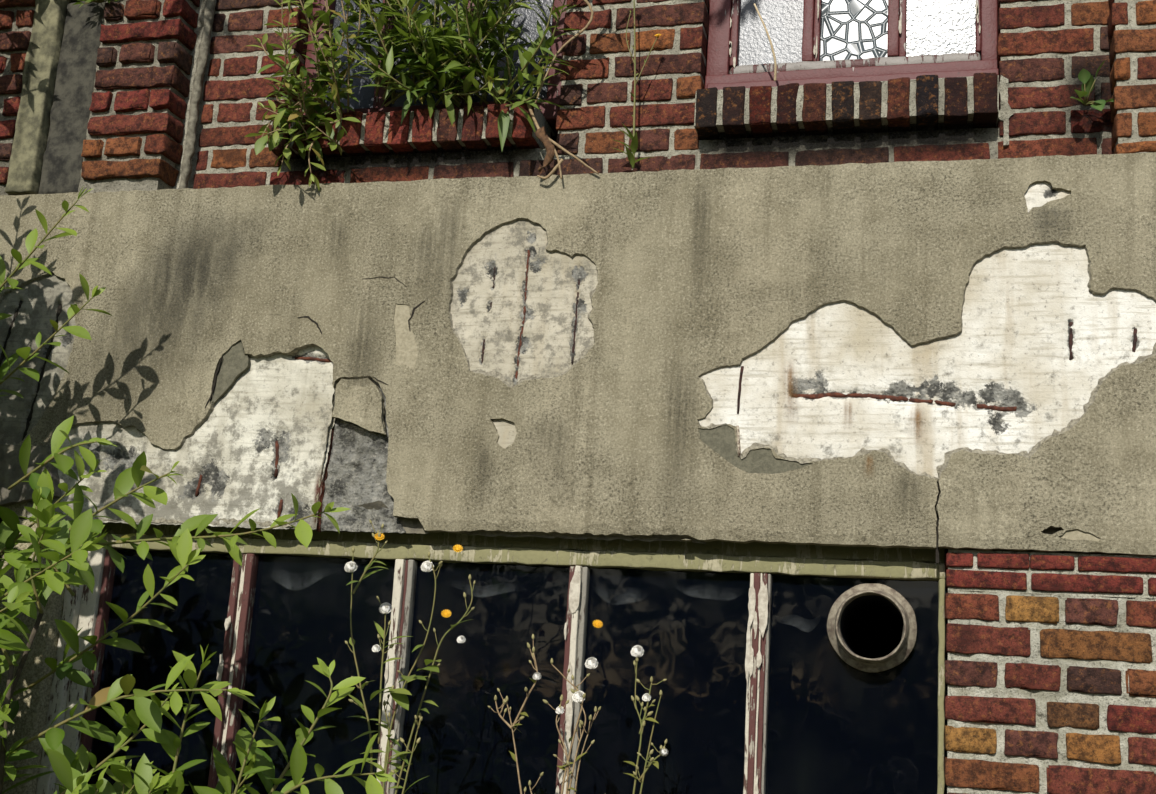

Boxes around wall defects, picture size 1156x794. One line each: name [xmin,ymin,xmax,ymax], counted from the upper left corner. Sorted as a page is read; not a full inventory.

spalling [1024,182,1070,212]
spalling [52,340,429,534]
spalling [492,419,517,448]
spalling [448,218,598,387]
spalling [697,241,1156,481]
crack [934,481,942,563]